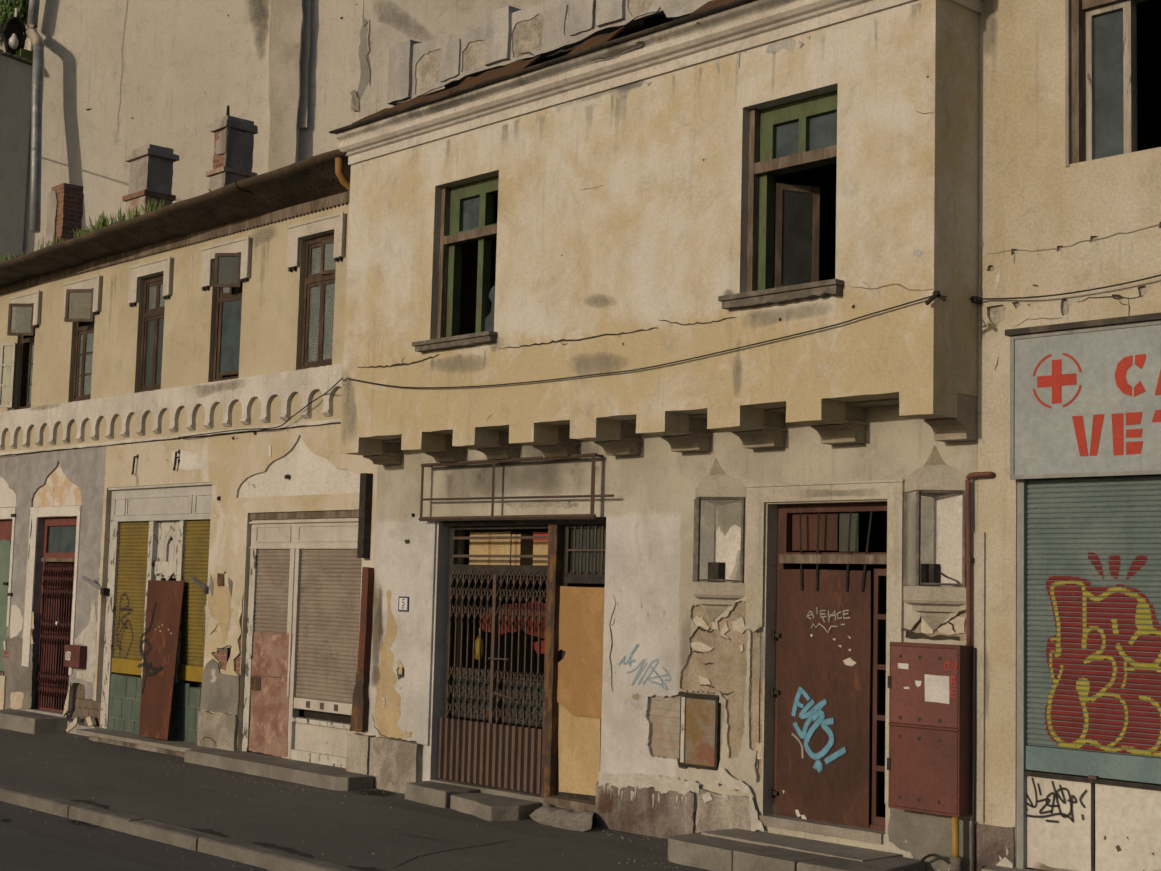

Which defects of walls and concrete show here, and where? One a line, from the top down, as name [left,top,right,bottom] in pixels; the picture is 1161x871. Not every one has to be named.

spalling [628,0,663,20]
spalling [416,49,445,96]
crack [979,224,1161,370]
crack [500,317,736,349]
crack [360,354,439,368]
peeling [205,576,243,683]
spalling [907,610,966,641]
peeling [373,590,412,740]
spalling [598,601,767,831]